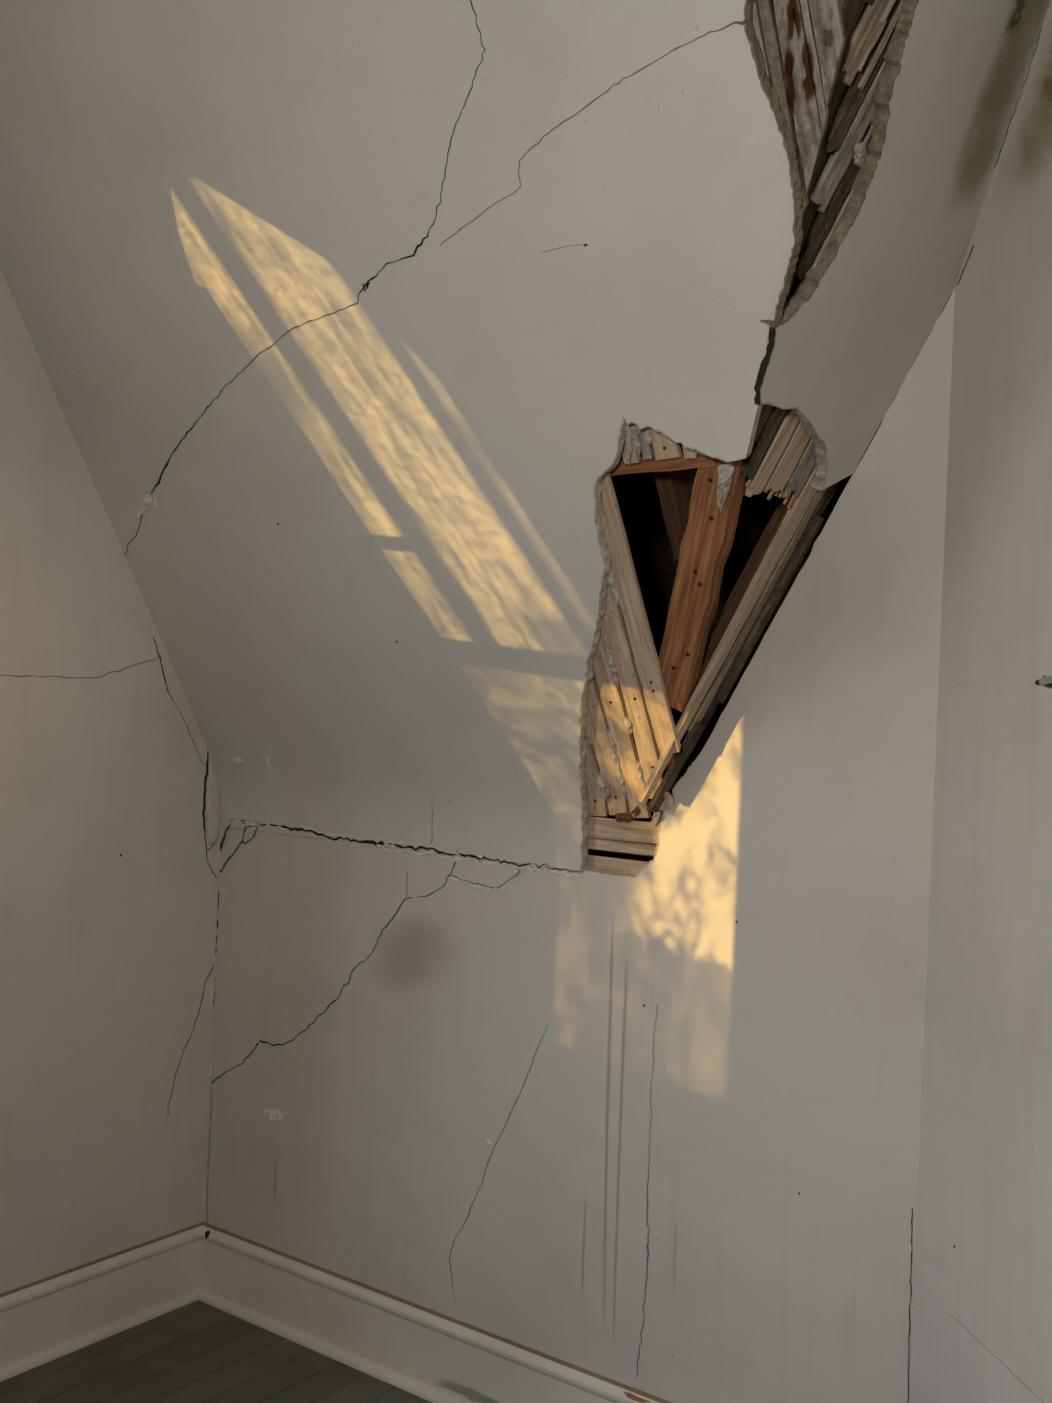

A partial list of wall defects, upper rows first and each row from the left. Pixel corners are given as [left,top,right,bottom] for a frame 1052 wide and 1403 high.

crack [125,0,747,555]
crack [754,327,776,405]
spalling [744,0,919,329]
spalling [578,402,840,878]
crack [0,637,582,1223]
crack [449,1023,548,1306]